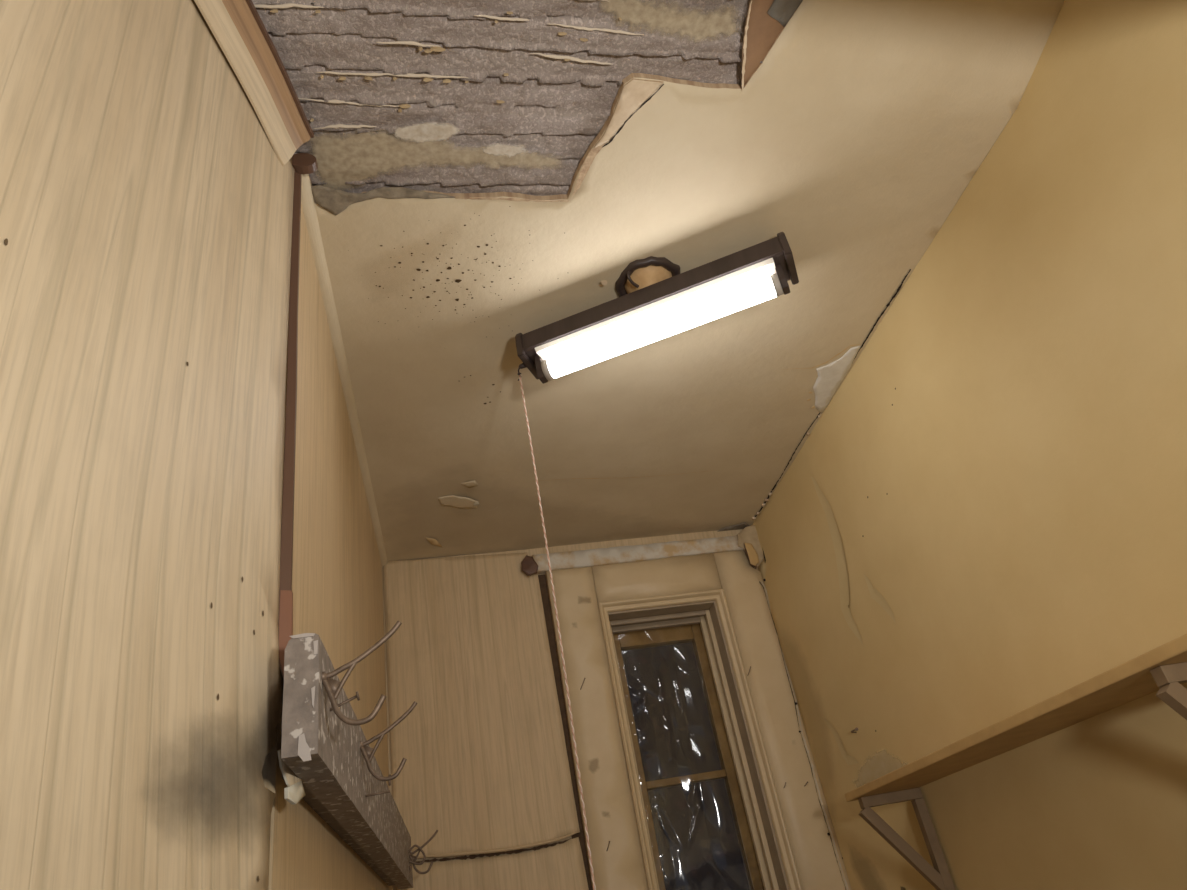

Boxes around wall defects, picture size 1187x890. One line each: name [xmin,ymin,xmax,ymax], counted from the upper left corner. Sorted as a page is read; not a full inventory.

flaking render [252,0,803,196]
damp [375,232,522,320]
peeling [781,344,861,413]